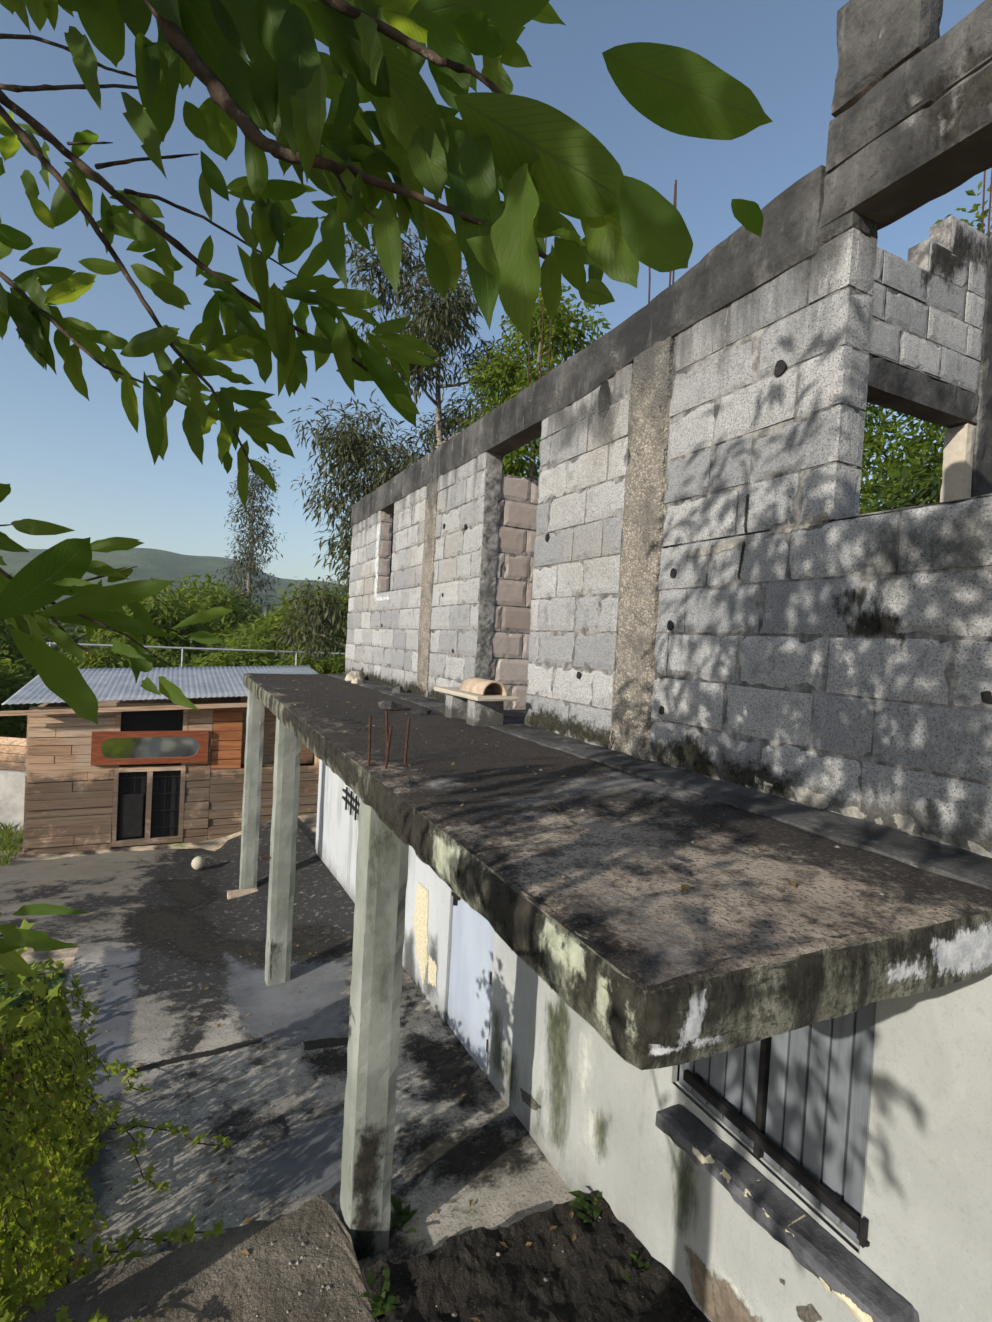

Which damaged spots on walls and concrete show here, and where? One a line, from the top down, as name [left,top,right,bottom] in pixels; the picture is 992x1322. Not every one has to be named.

water stain [833,587,905,650]
water stain [456,849,554,968]
peeling [887,924,992,984]
water stain [547,925,938,1148]
water stain [677,1154,696,1227]
peeling [692,1145,759,1197]
spalling [796,1304,822,1322]
peeling [819,1277,873,1322]